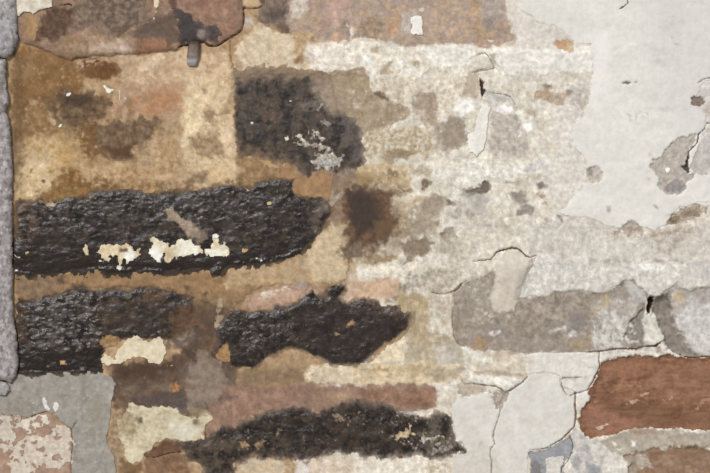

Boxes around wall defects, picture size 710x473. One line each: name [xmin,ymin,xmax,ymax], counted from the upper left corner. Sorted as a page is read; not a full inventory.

damp [285,97,346,171]
spalling [650,134,696,195]
peeling [83,234,230,270]
crack [473,246,537,290]
flaking render [451,270,710,439]
peeling [0,397,76,473]
crack [457,377,527,473]
crack [484,341,710,473]